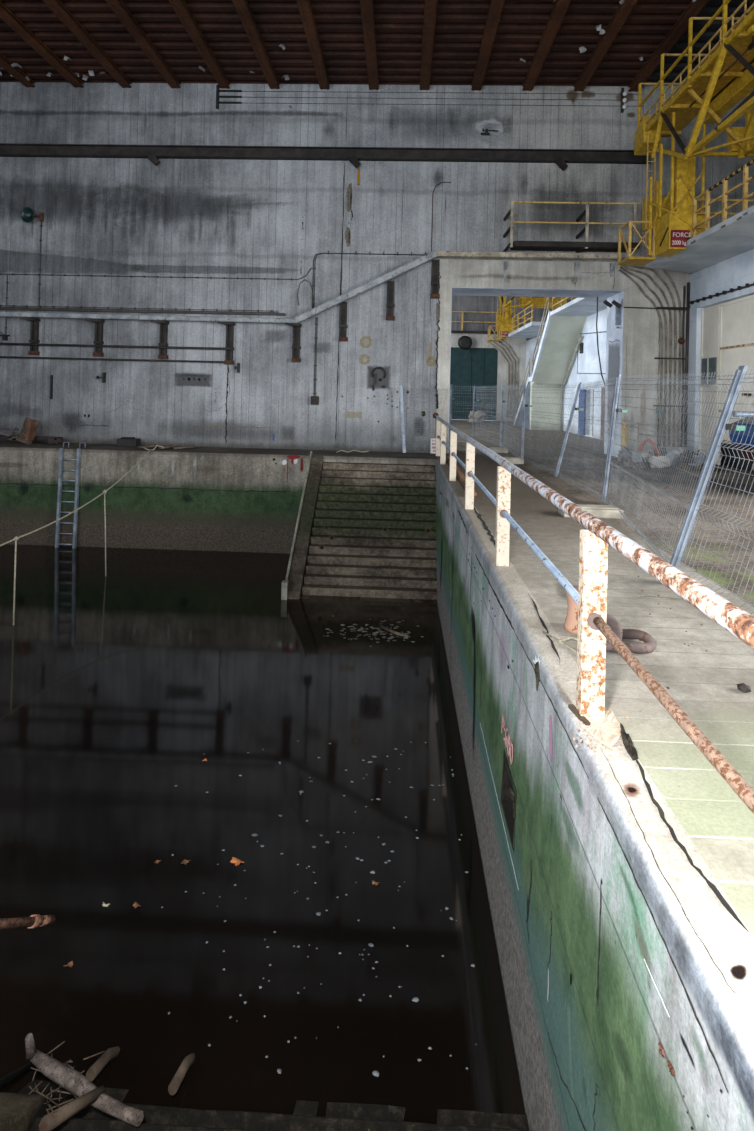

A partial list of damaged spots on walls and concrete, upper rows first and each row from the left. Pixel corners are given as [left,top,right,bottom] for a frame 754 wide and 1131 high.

crack [548,1033,598,1131]